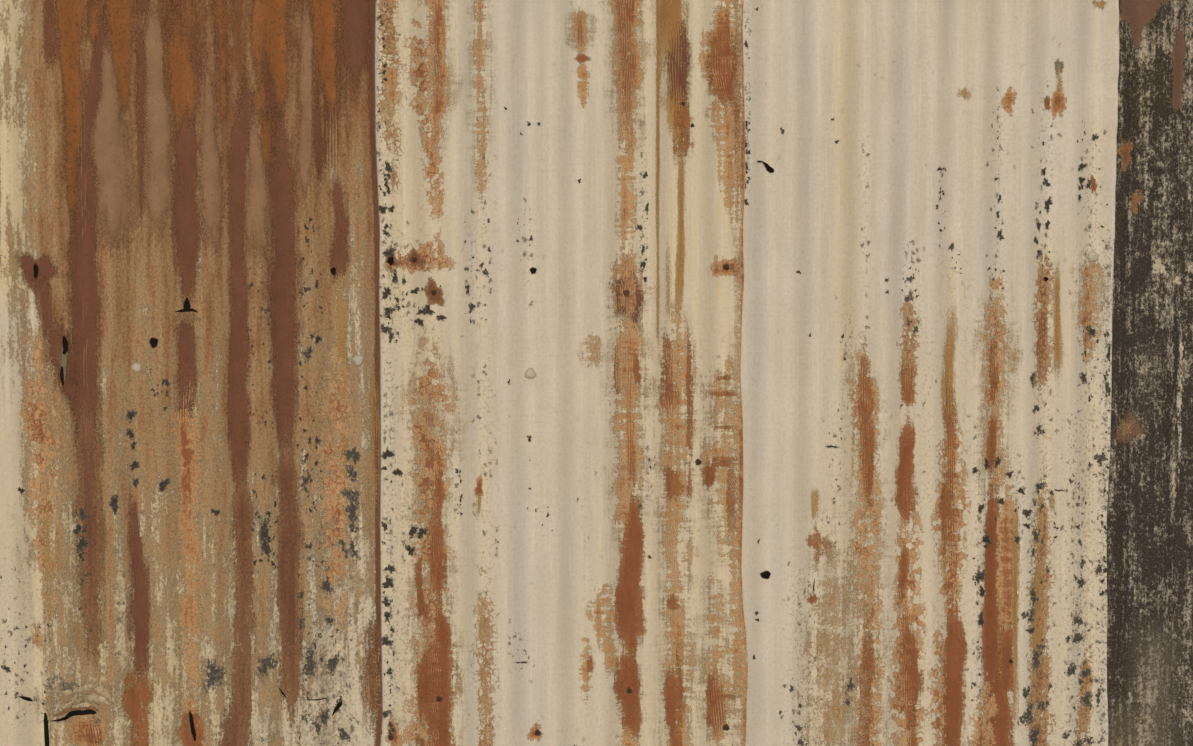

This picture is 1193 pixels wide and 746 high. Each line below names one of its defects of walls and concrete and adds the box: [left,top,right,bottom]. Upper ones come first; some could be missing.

corrosion [471,0,489,198]
corrosion [567,9,594,108]
corrosion [1001,87,1017,117]
corrosion [1044,59,1067,120]
corrosion [0,0,462,746]
corrosion [579,0,748,746]
corrosion [1032,254,1063,403]
corrosion [474,475,483,513]
corrosion [797,273,1056,746]
corrosion [471,591,499,746]
corrosion [527,723,542,741]